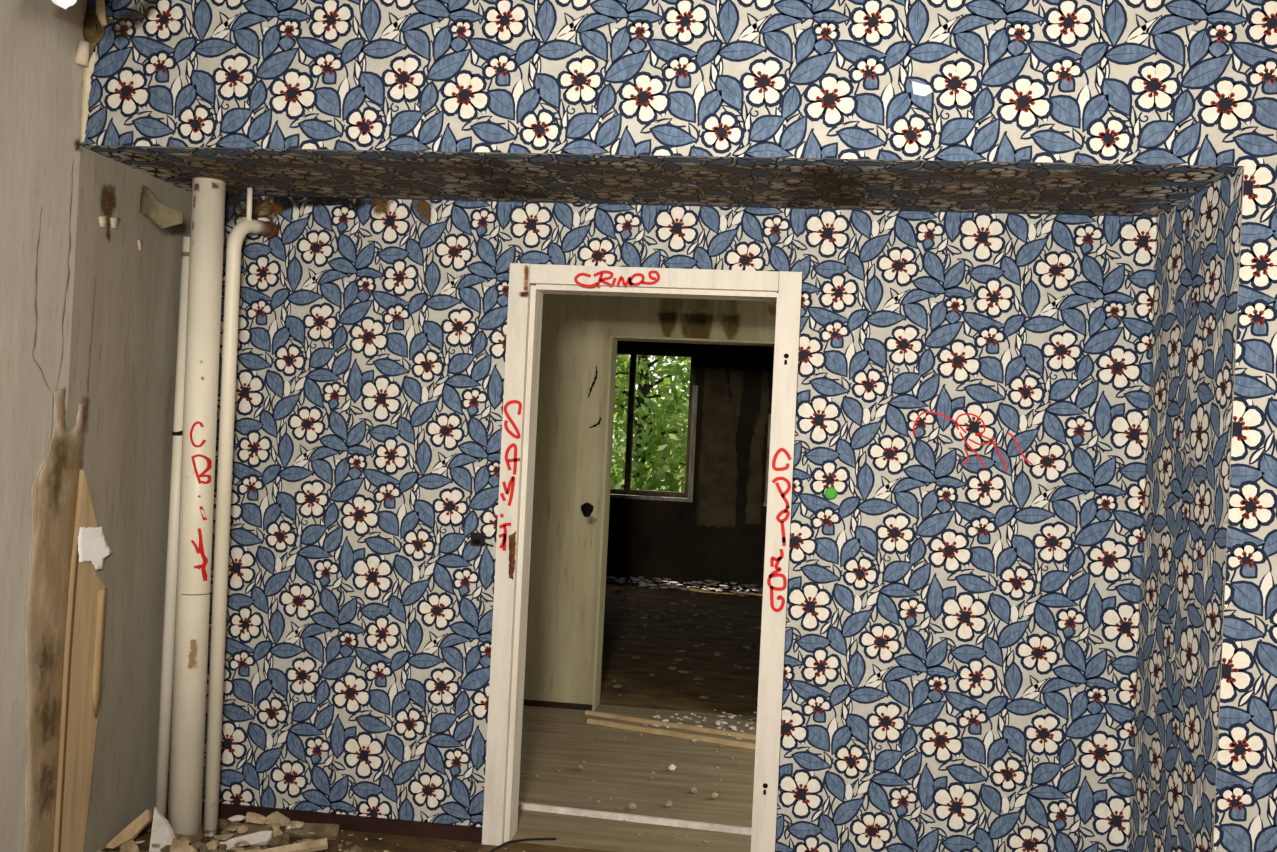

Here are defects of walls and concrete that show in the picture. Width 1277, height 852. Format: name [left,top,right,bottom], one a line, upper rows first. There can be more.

flaking render [52,0,155,143]
peeling [24,387,112,852]